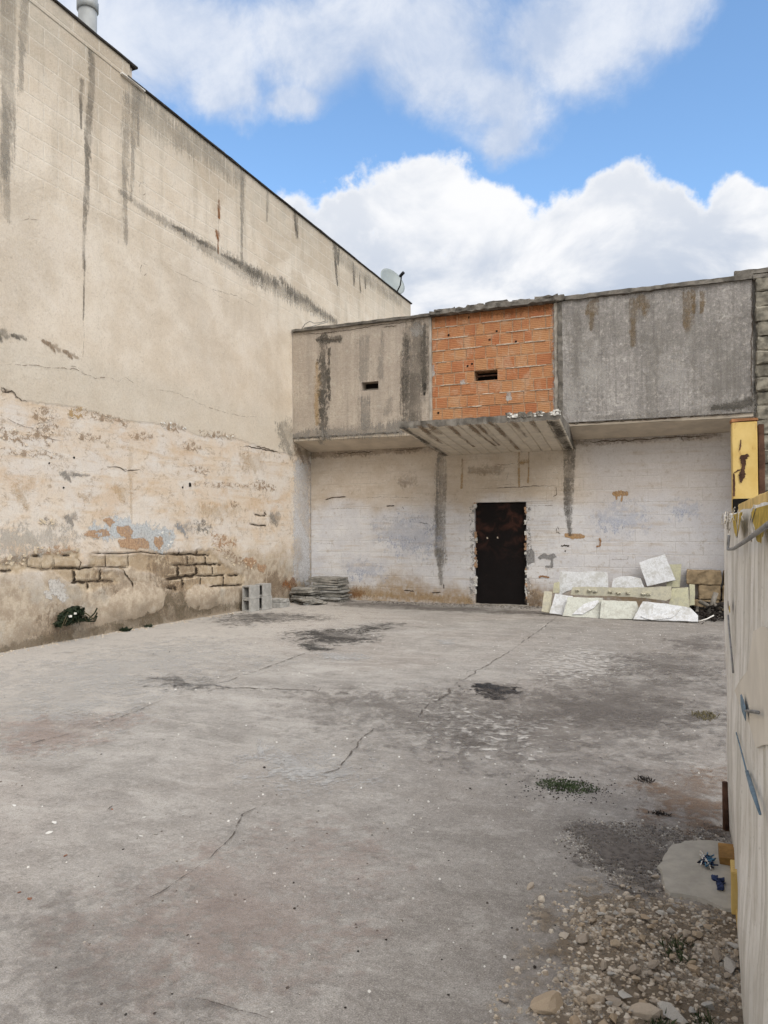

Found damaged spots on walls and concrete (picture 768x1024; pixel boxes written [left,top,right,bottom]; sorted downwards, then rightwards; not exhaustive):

damp [230,181,263,282]
peeling [0,407,60,464]
peeling [68,407,235,453]
peeling [84,515,175,554]
peeling [182,466,276,492]
peeling [194,520,266,573]
damp [267,333,536,597]
flaking render [469,502,498,604]
damp [564,478,574,535]
crack [309,728,374,783]
crack [151,808,255,897]
crack [195,998,271,1019]